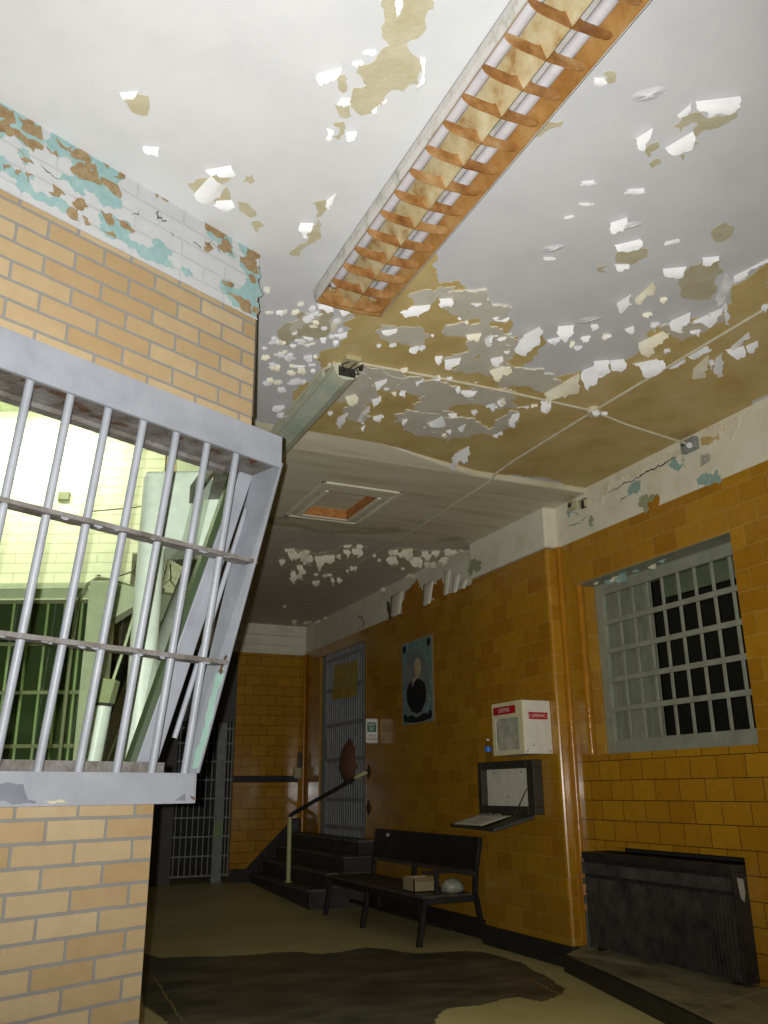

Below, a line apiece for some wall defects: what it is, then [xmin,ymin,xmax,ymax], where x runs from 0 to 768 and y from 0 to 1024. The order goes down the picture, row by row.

peeling [120,90,150,116]
peeling [316,0,434,142]
peeling [636,96,742,168]
peeling [0,102,193,277]
peeling [187,165,264,232]
peeling [624,188,645,196]
peeling [203,217,768,488]
crack [608,456,677,500]
peeling [628,480,660,514]
peeling [278,544,482,617]